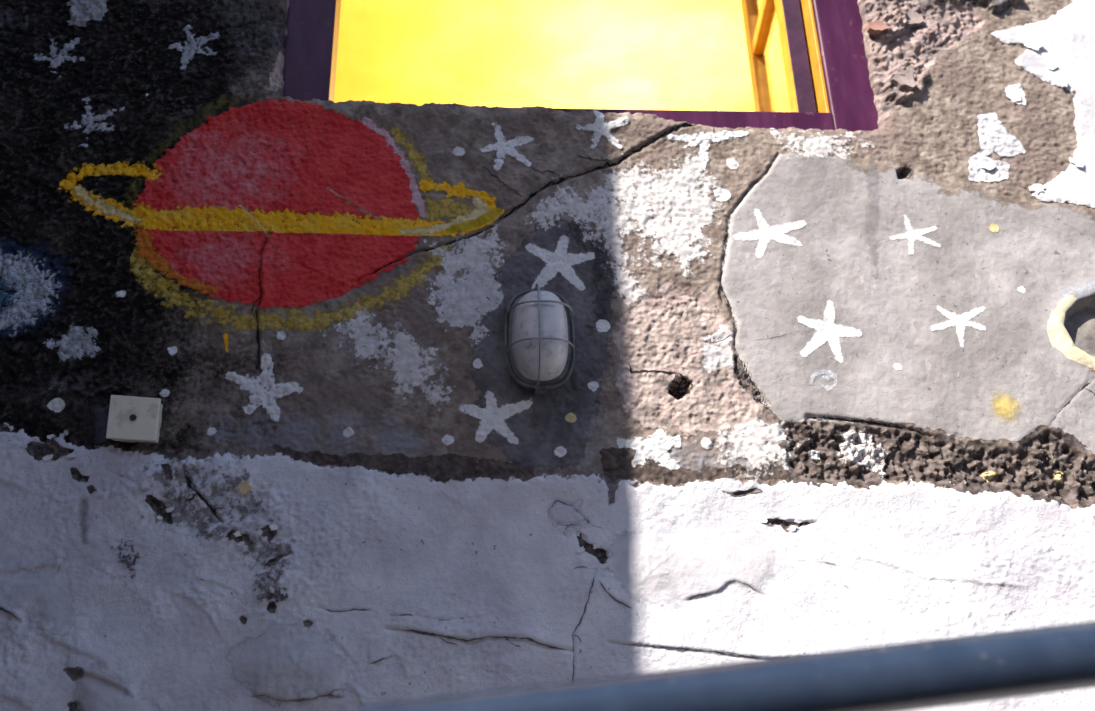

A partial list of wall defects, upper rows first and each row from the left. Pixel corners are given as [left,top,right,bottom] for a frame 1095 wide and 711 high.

crack [357,123,714,281]
peeling [770,128,875,160]
peeling [858,0,1095,208]
crack [252,237,268,365]
spalling [526,151,1095,507]
spalling [142,450,293,613]
spalling [758,518,809,532]
crack [322,606,366,614]
crack [385,566,633,681]